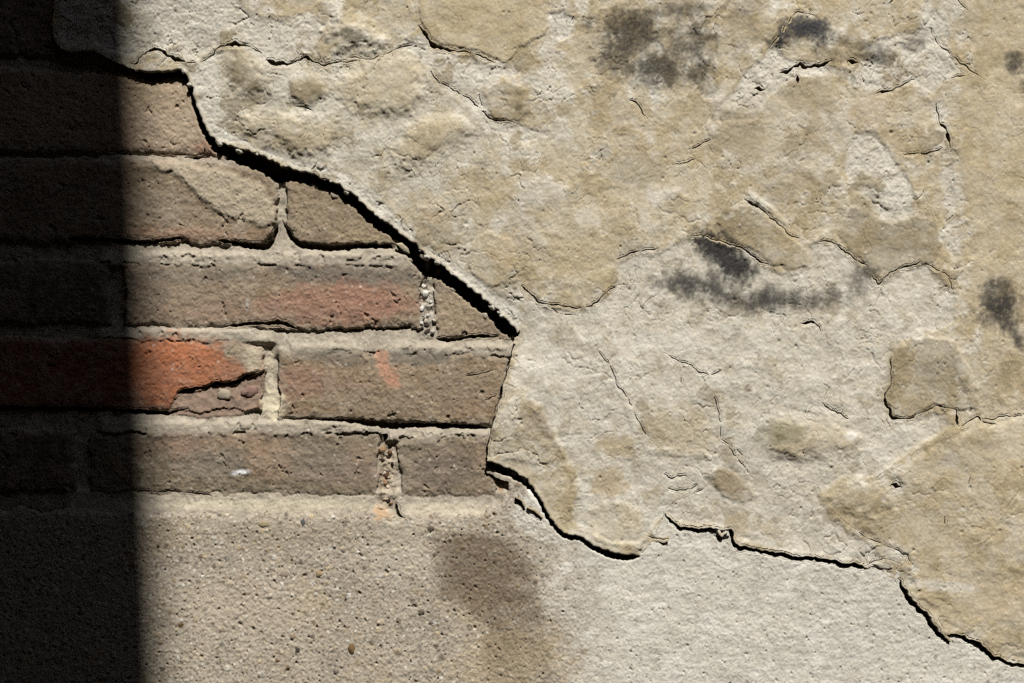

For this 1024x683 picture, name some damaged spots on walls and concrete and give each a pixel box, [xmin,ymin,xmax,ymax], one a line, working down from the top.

flaking render [59,0,328,144]
crack [768,10,833,85]
crack [875,29,995,157]
damp [666,273,721,296]
crack [684,233,772,266]
damp [737,285,801,310]
crack [799,319,823,333]
crack [732,194,956,292]
spalling [168,369,267,420]
crack [662,351,754,480]
crack [881,355,1024,428]
crack [644,514,1024,668]